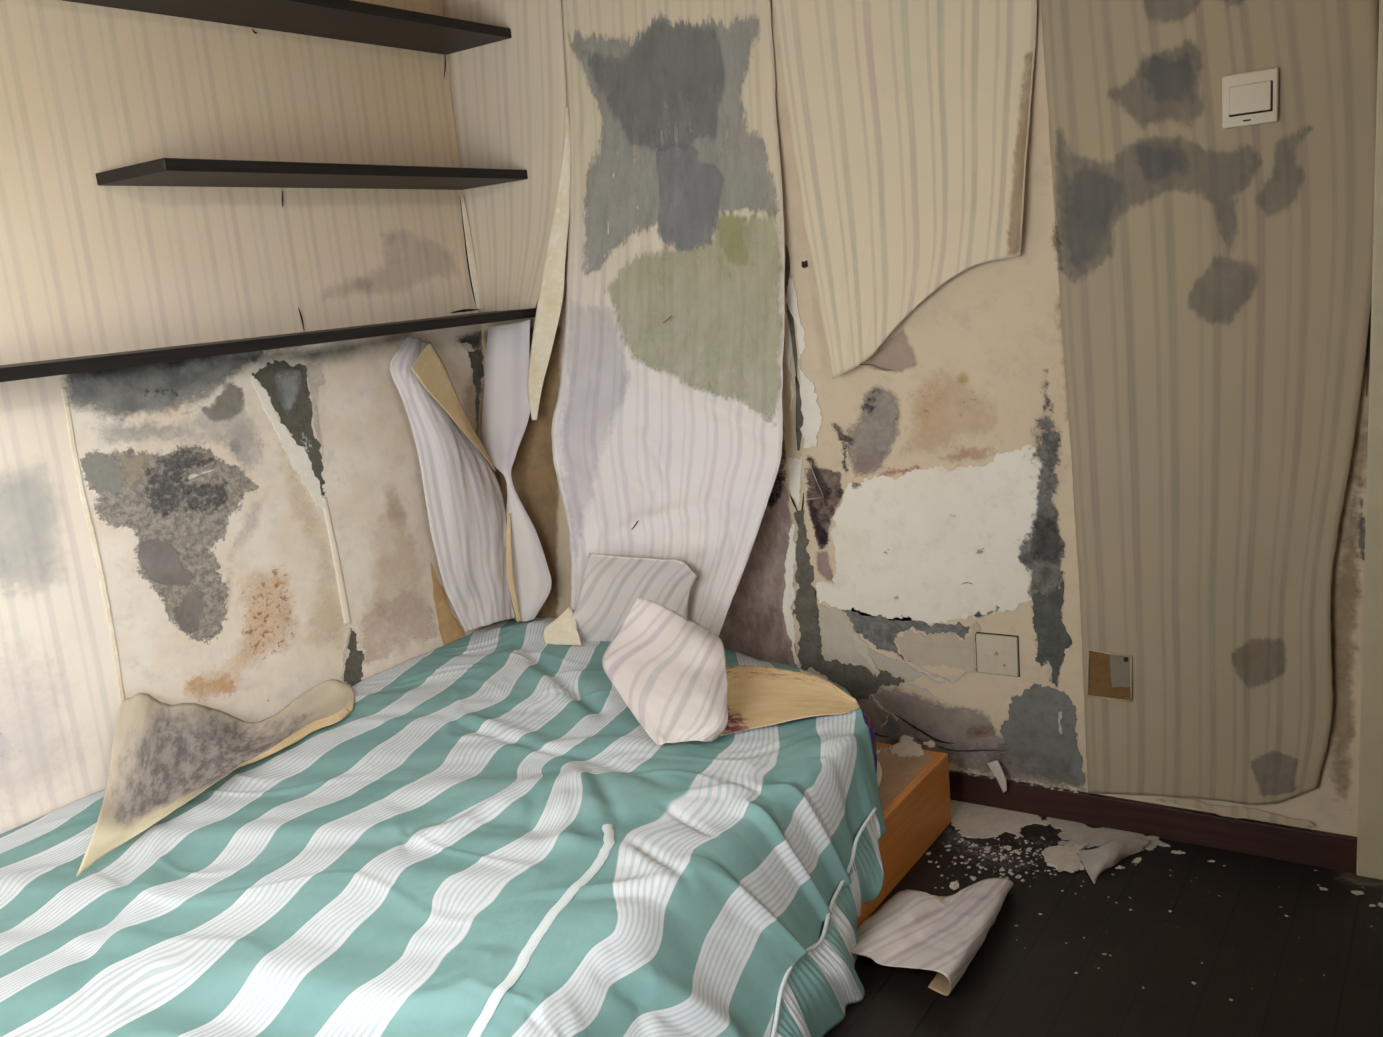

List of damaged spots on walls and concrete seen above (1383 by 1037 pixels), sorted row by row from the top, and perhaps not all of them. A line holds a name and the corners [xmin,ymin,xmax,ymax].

leakage [67,351,262,644]
peeling [61,324,502,722]
peeling [815,444,1052,702]
peeling [877,735,935,757]
spalling [994,649,1132,787]